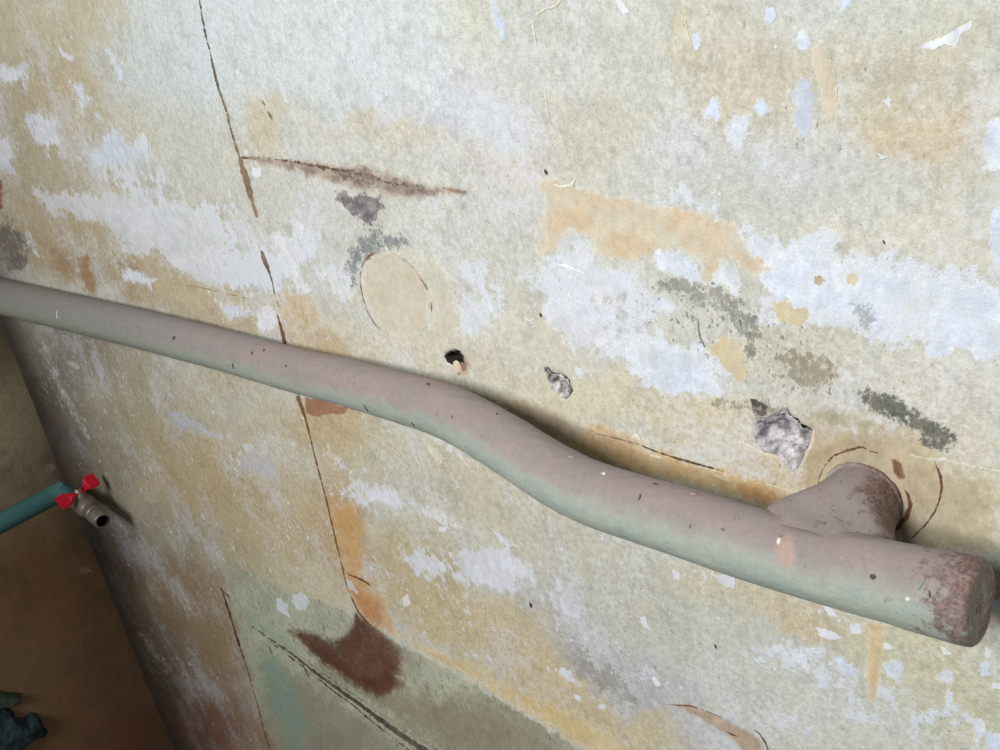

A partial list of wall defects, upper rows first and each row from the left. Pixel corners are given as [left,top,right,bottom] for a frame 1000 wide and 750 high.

peeling [23,107,67,161]
crack [199,0,258,218]
peeling [22,183,280,335]
crack [260,250,286,344]
crack [296,395,371,592]
spalling [544,366,572,399]
peeling [624,334,747,401]
peeling [537,179,1000,362]
spalling [739,399,815,472]
leakage [801,387,1000,551]
crack [220,588,437,750]
rust [288,505,404,699]